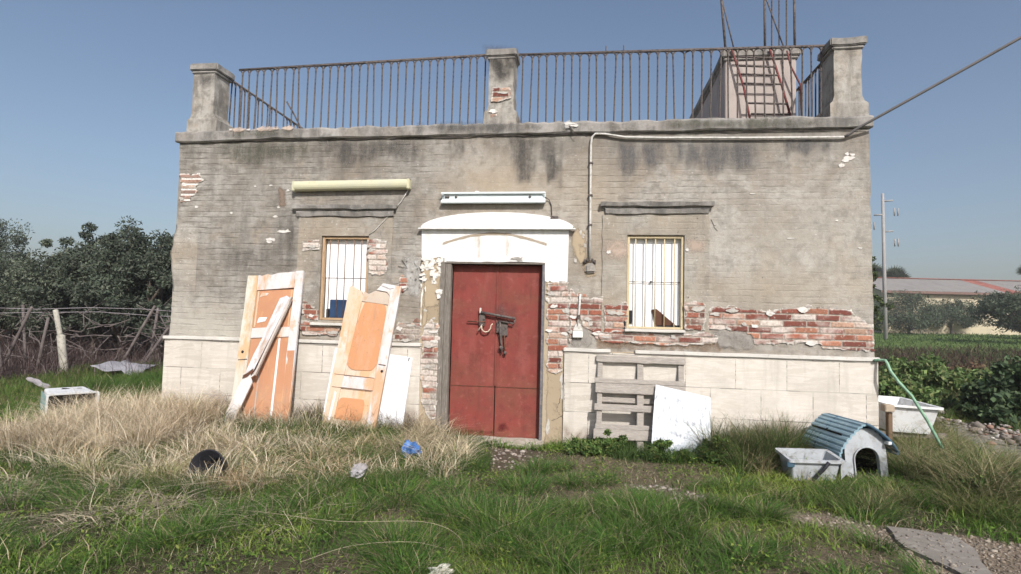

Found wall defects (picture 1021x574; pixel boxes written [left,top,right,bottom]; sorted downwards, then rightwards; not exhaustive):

spalling [489,87,511,117]
damp [516,141,529,180]
damp [542,142,555,180]
spalling [179,173,203,208]
spalling [366,239,388,276]
spalling [392,257,444,420]
spalling [544,281,875,444]